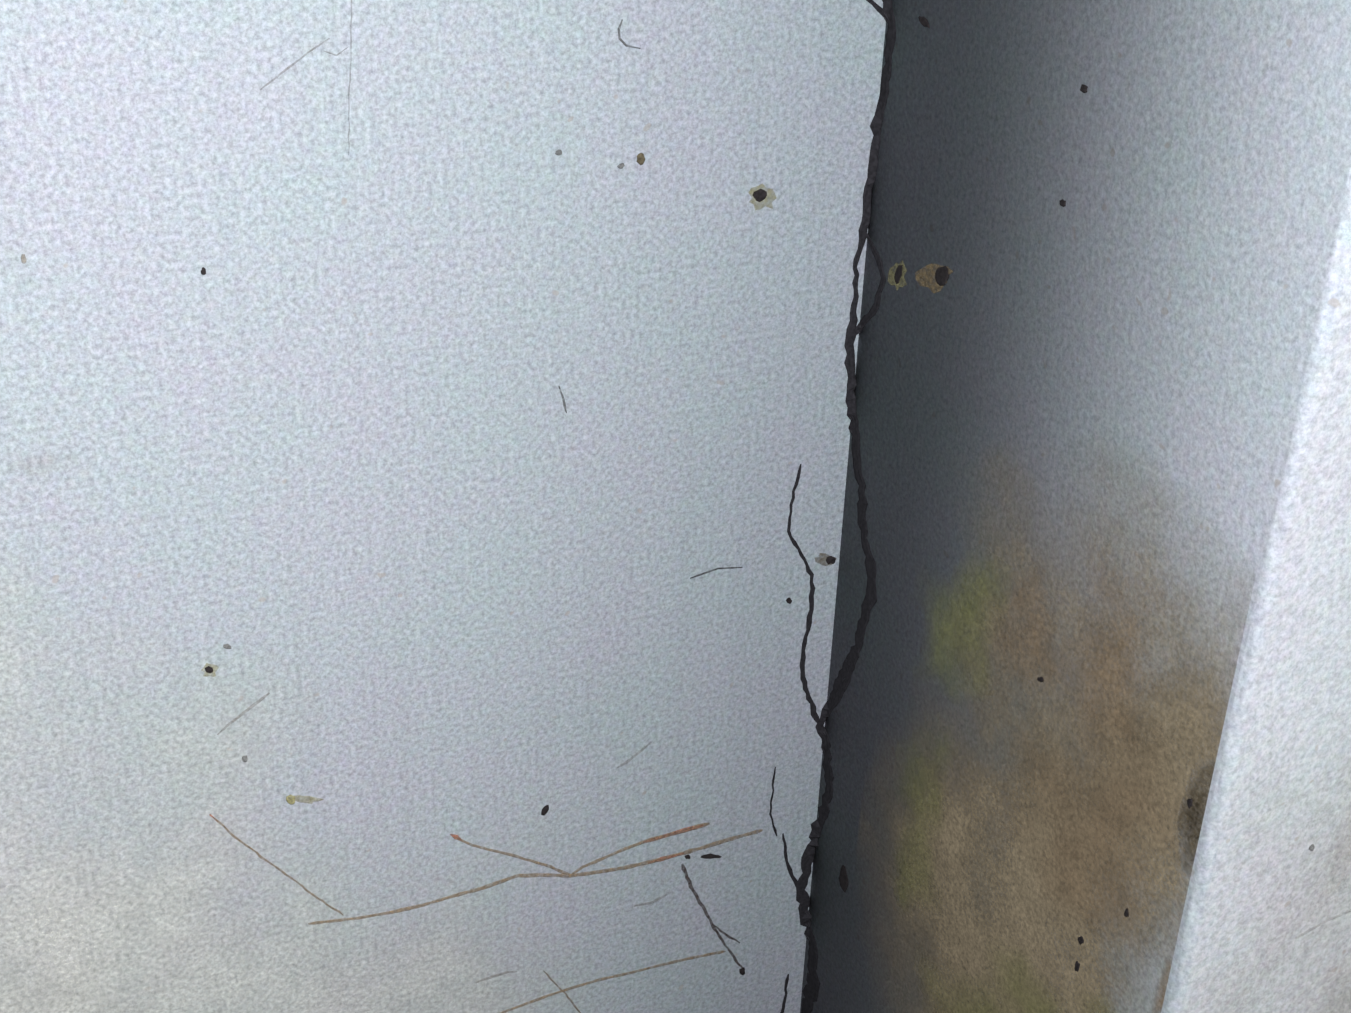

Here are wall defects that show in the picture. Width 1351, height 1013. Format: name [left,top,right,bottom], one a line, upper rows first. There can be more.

crack [209,0,896,1013]
damp [896,543,1224,1013]